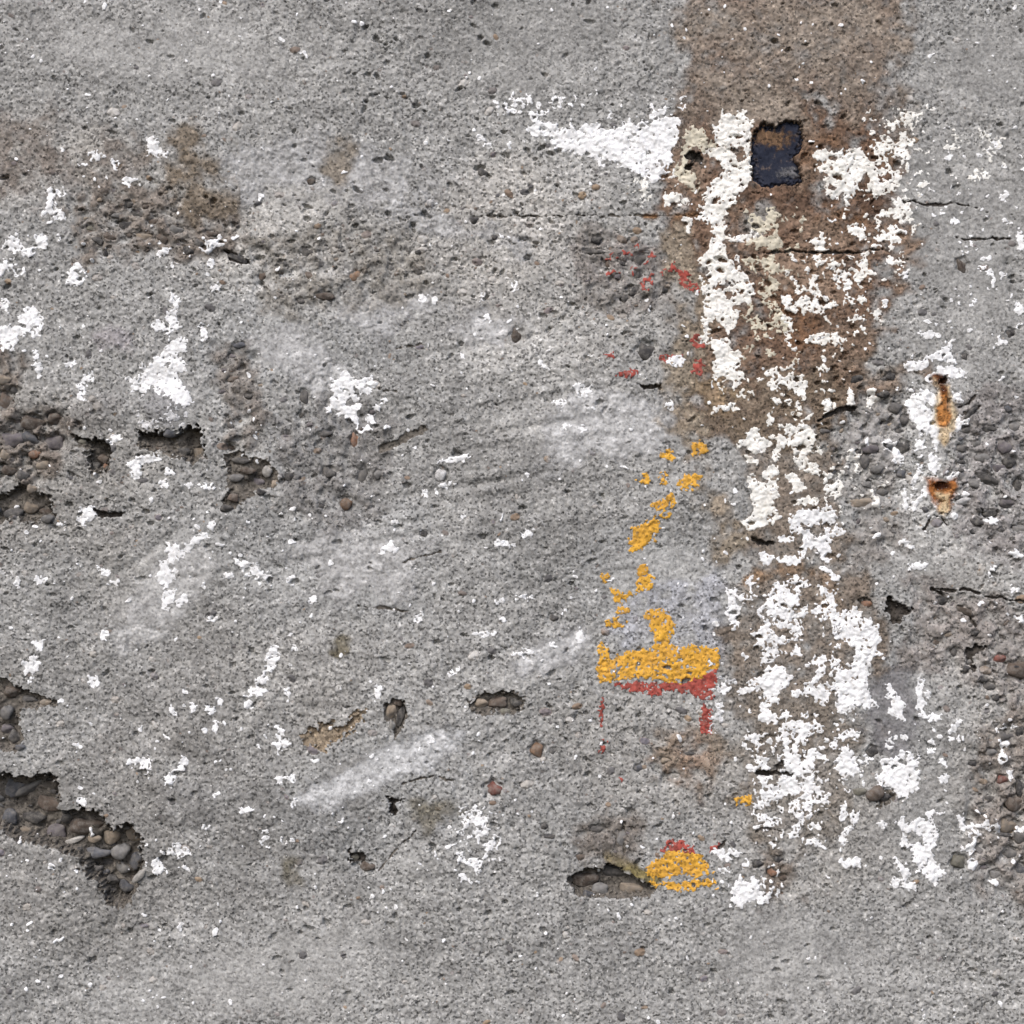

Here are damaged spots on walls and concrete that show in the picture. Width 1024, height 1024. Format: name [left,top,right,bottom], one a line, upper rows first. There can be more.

crack [763,247,883,255]
crack [902,200,978,209]
crack [955,234,1011,242]
spalling [0,298,126,531]
peeling [124,292,210,489]
peeling [155,342,399,612]
peeling [492,89,1024,909]
corrosion [643,0,924,843]
corrosion [918,368,956,445]
corrosion [928,479,957,514]
crack [930,587,1024,628]
spalling [0,771,192,910]